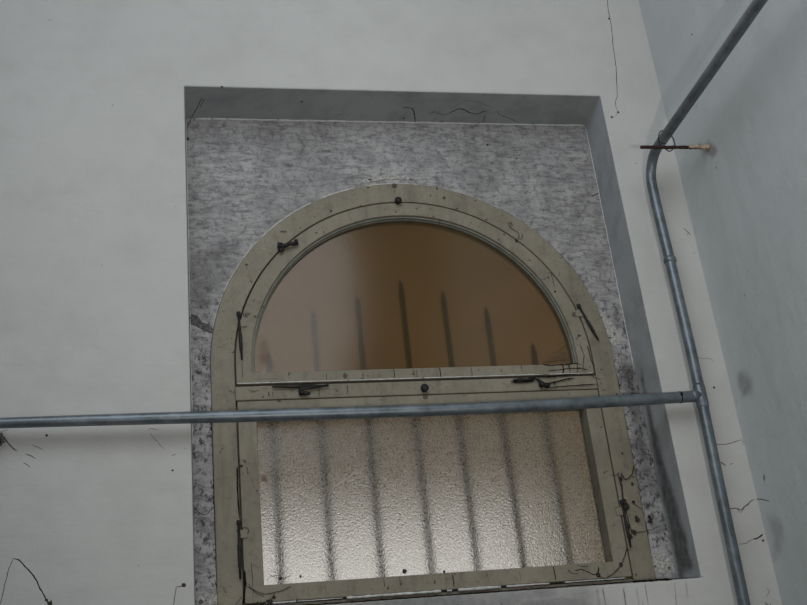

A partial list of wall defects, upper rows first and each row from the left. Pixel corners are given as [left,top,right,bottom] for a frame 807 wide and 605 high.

crack [607,0,619,118]
crack [405,100,521,150]
crack [730,499,768,513]
crack [0,558,52,605]